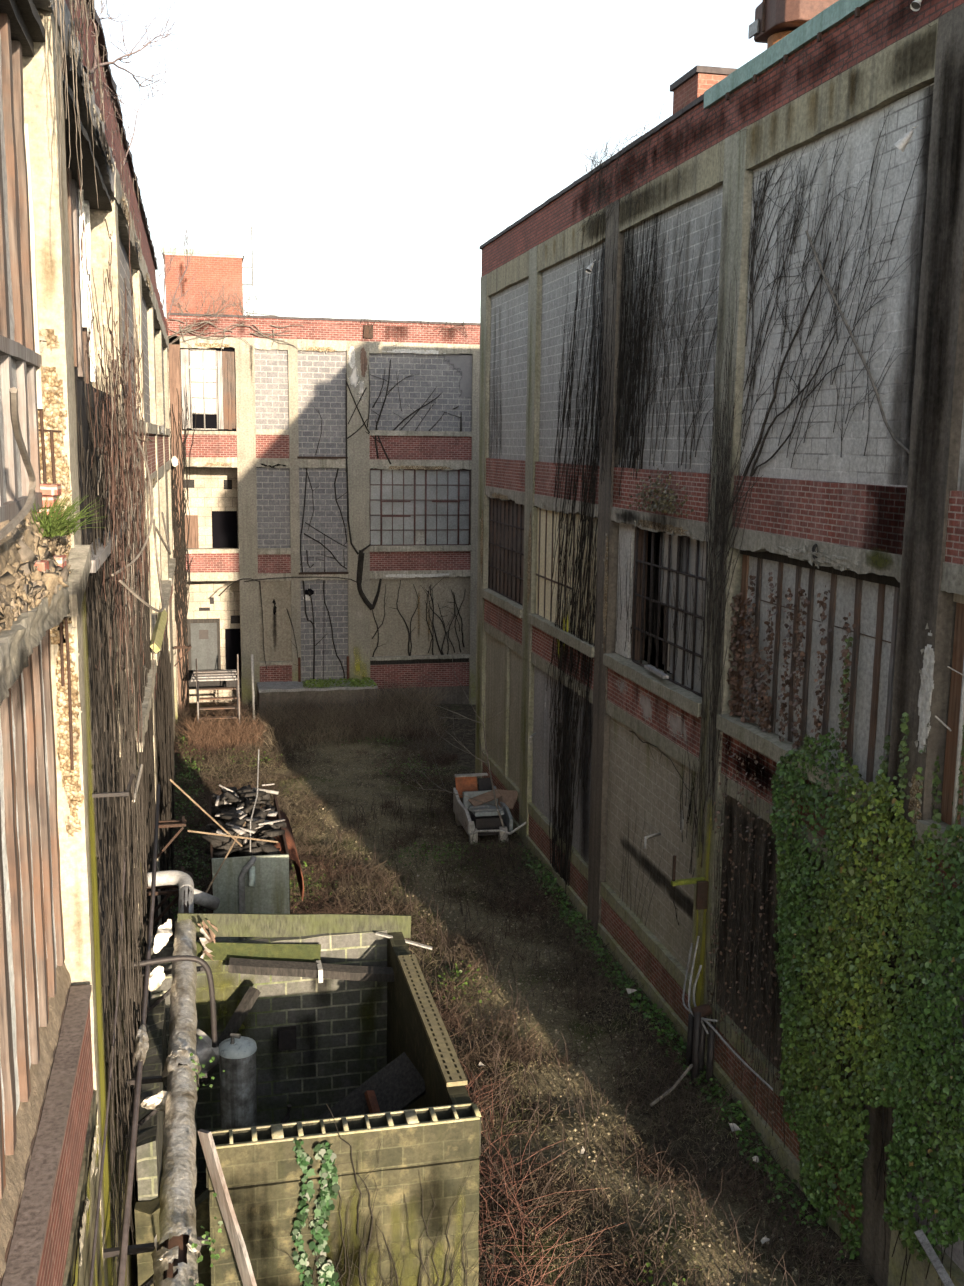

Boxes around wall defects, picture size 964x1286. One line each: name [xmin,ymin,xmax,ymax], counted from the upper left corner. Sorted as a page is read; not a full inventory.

damp [581,123,706,404]
damp [864,80,962,555]
damp [88,732,144,1286]
damp [232,1197,265,1246]
damp [325,1234,371,1286]